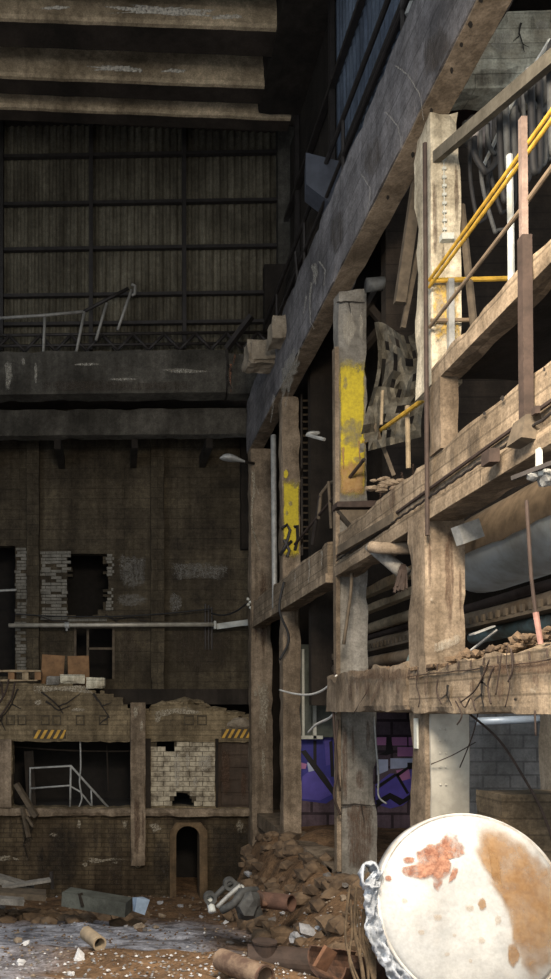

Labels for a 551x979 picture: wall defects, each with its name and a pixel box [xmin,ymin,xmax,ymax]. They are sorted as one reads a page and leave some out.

spalling [14,548,27,673]
spalling [40,551,144,622]